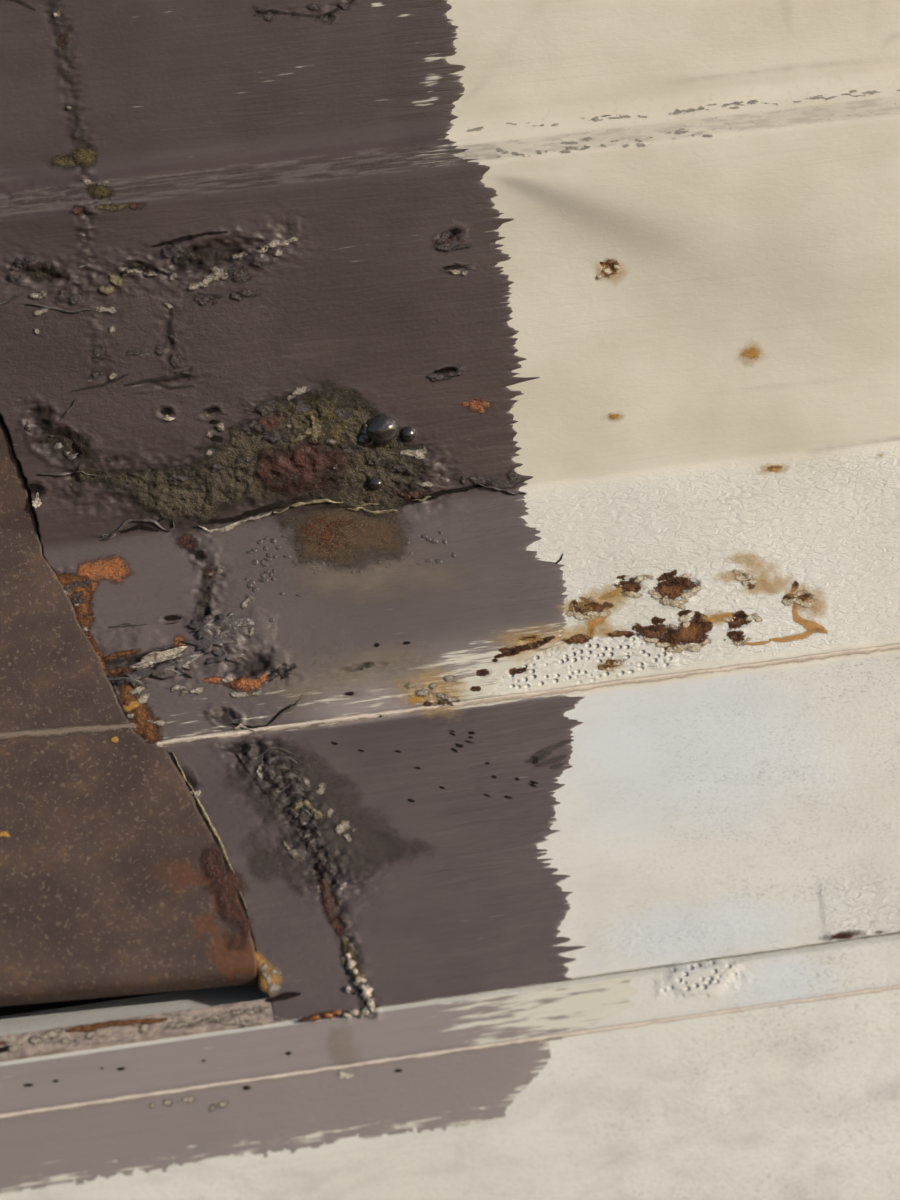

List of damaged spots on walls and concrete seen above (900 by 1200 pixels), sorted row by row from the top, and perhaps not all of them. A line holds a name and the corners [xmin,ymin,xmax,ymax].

rust [596,259,621,279]
rust [743,348,759,358]
rust [729,557,763,590]
rust [55,555,166,743]
peeling [101,595,298,698]
rust [406,676,460,707]
rust [470,570,828,691]
water stain [229,741,426,890]
rust [0,843,374,1062]